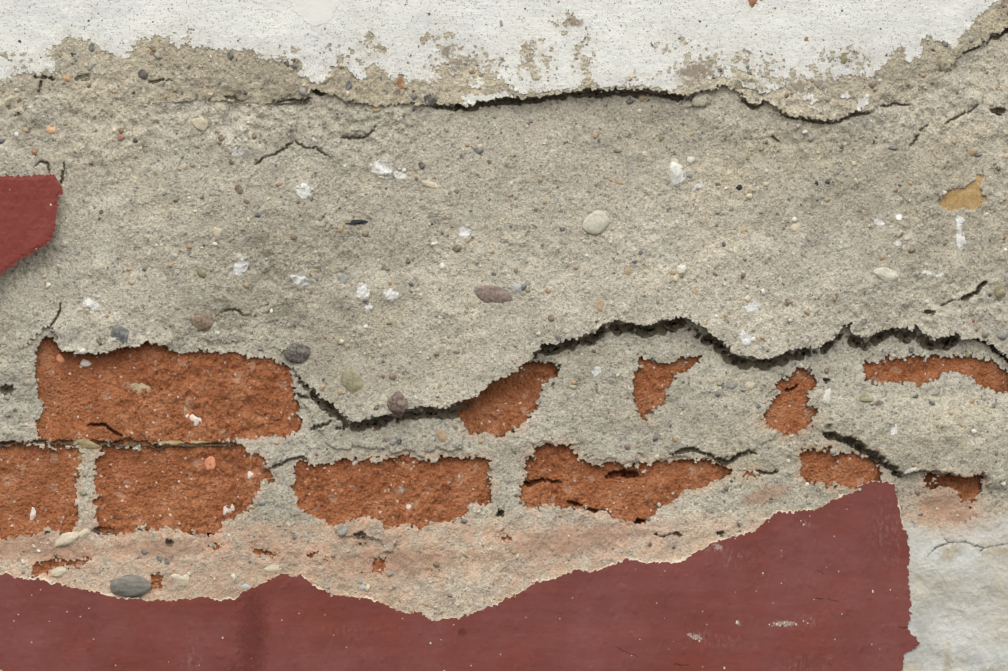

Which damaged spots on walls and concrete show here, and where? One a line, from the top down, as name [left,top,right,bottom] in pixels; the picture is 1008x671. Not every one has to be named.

crack [964,28,1008,53]
crack [432,91,693,111]
crack [741,98,911,142]
crack [909,104,979,146]
spalling [0,31,1008,422]
crack [533,318,1008,391]
crack [295,376,478,431]
crack [0,423,237,450]
crack [269,456,309,469]
crack [823,432,902,478]
spalling [0,310,1008,671]